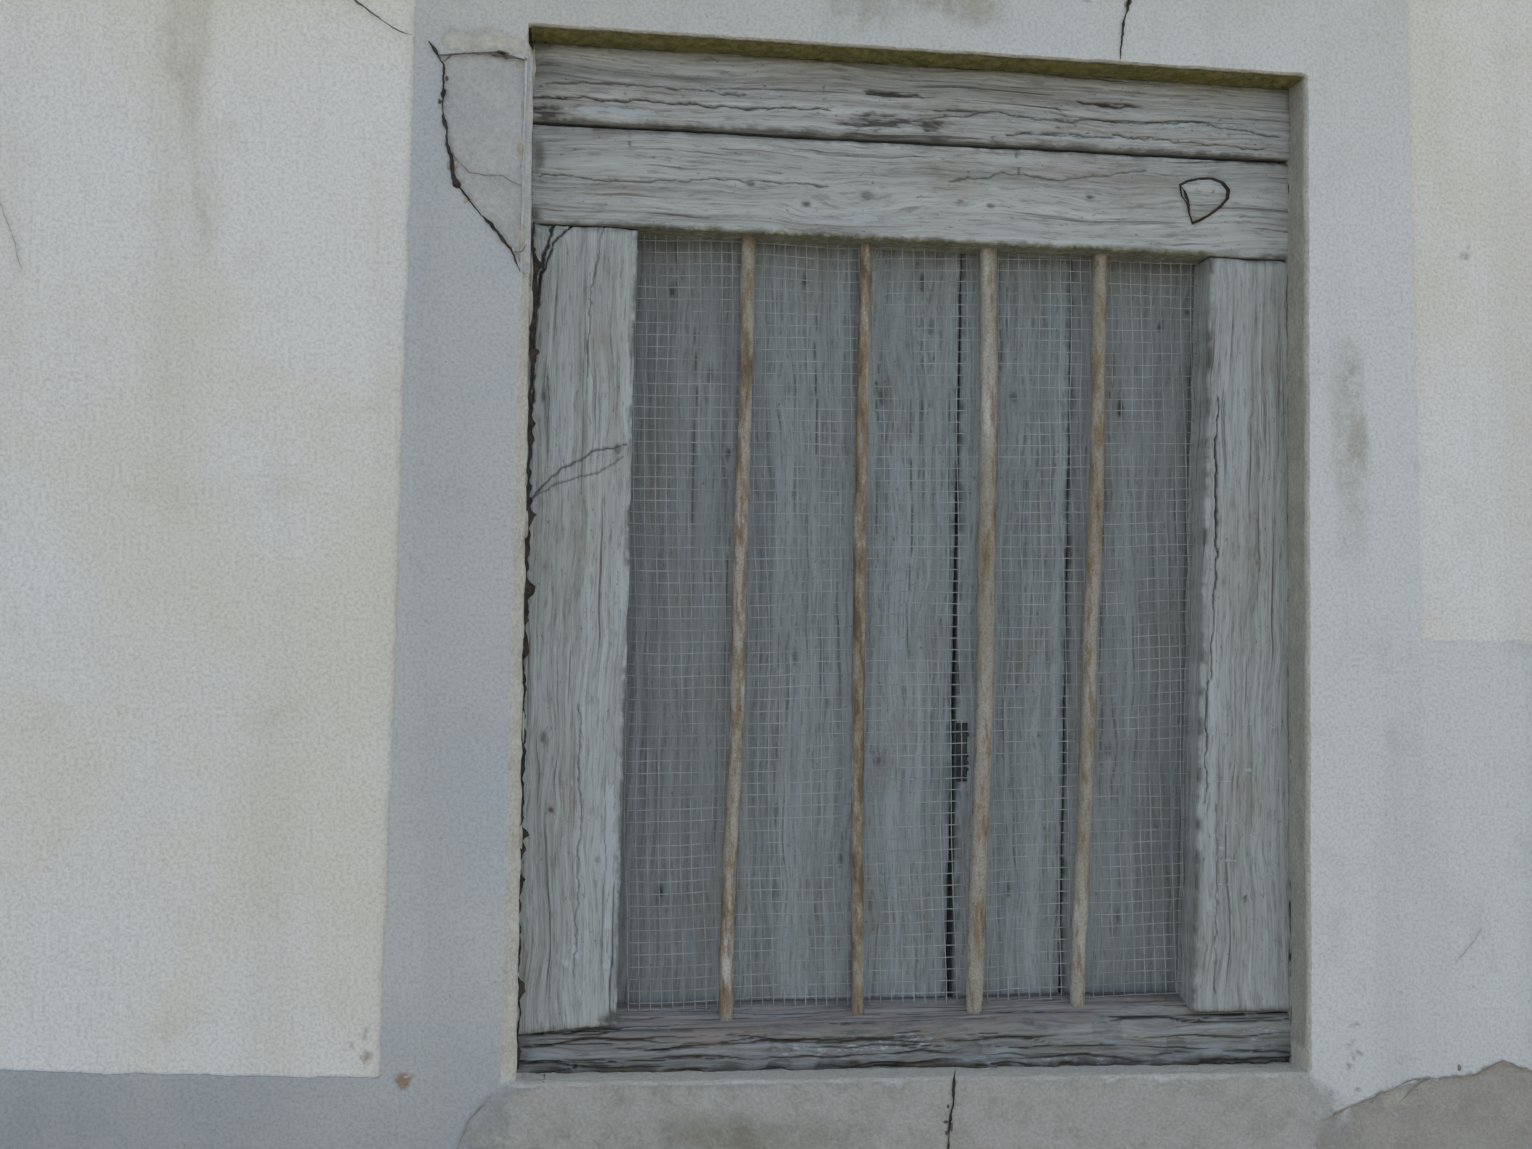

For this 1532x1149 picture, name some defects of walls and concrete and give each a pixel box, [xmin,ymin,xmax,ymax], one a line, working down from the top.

crack [1120,0,1132,59]
crack [354,0,544,1069]
crack [458,1100,487,1149]
crack [943,1070,956,1149]
flaking render [471,1061,1532,1149]